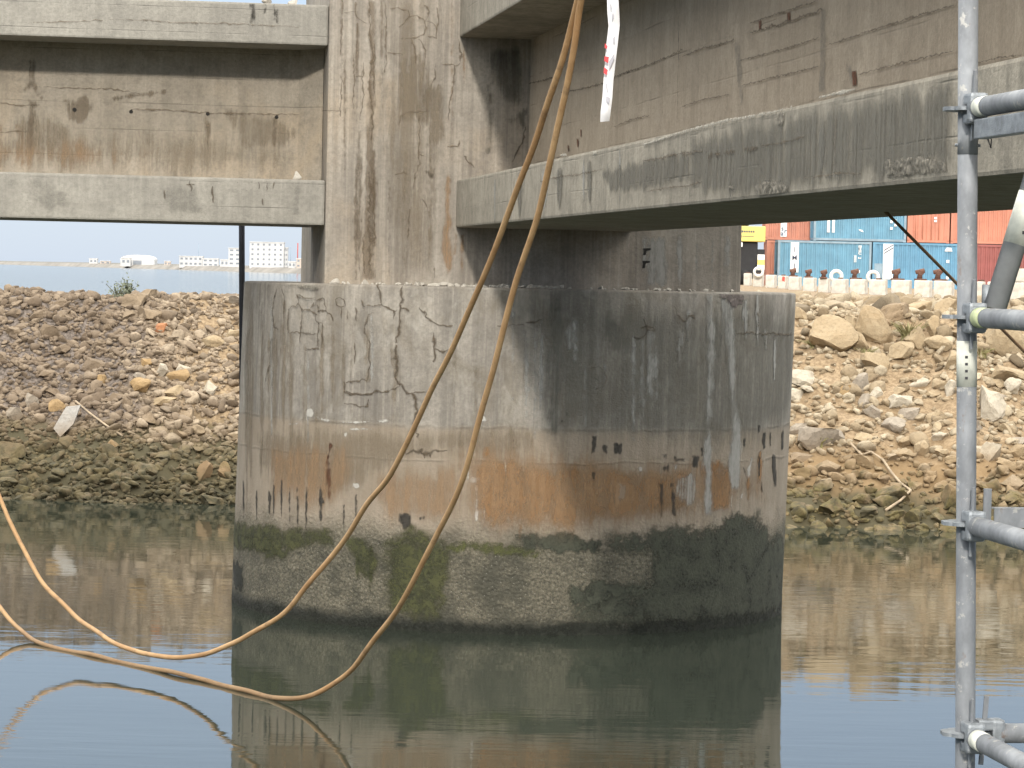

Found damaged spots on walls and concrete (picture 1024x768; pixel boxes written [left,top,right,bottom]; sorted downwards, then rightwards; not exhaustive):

water stain [354,2,382,279]
water stain [583,88,947,203]
crack [265,1,472,459]
water stain [243,480,324,528]
water stain [399,513,424,529]
corrosion [477,449,687,530]
corrosion [701,461,730,509]